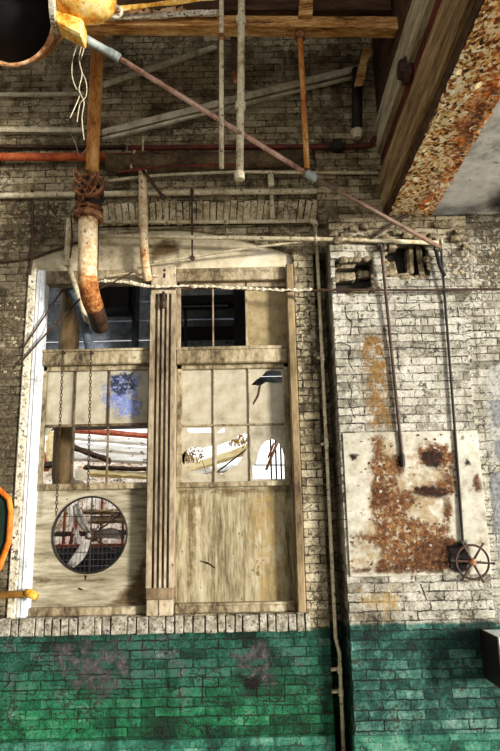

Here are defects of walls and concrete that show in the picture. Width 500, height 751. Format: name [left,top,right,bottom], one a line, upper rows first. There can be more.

spalling [328,76,500,288]
spalling [330,256,380,296]
rust [348,434,458,574]